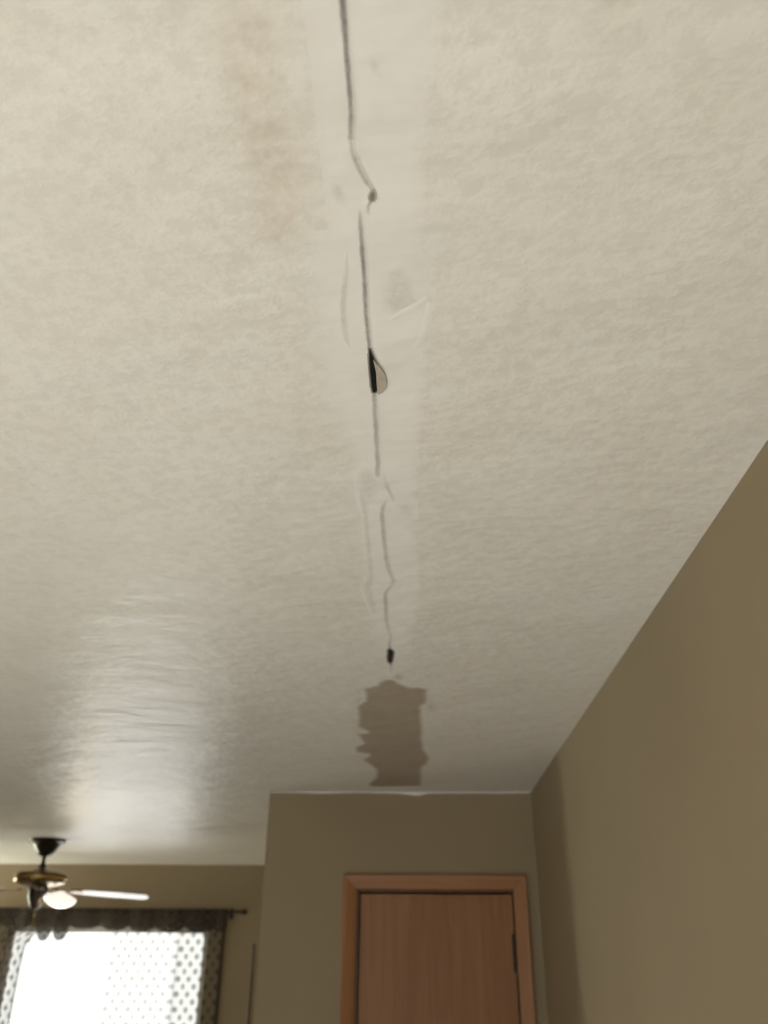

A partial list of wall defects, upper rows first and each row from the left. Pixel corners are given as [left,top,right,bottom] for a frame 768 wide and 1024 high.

crack [337,0,377,351]
crack [371,393,397,649]
peeling [347,648,441,787]